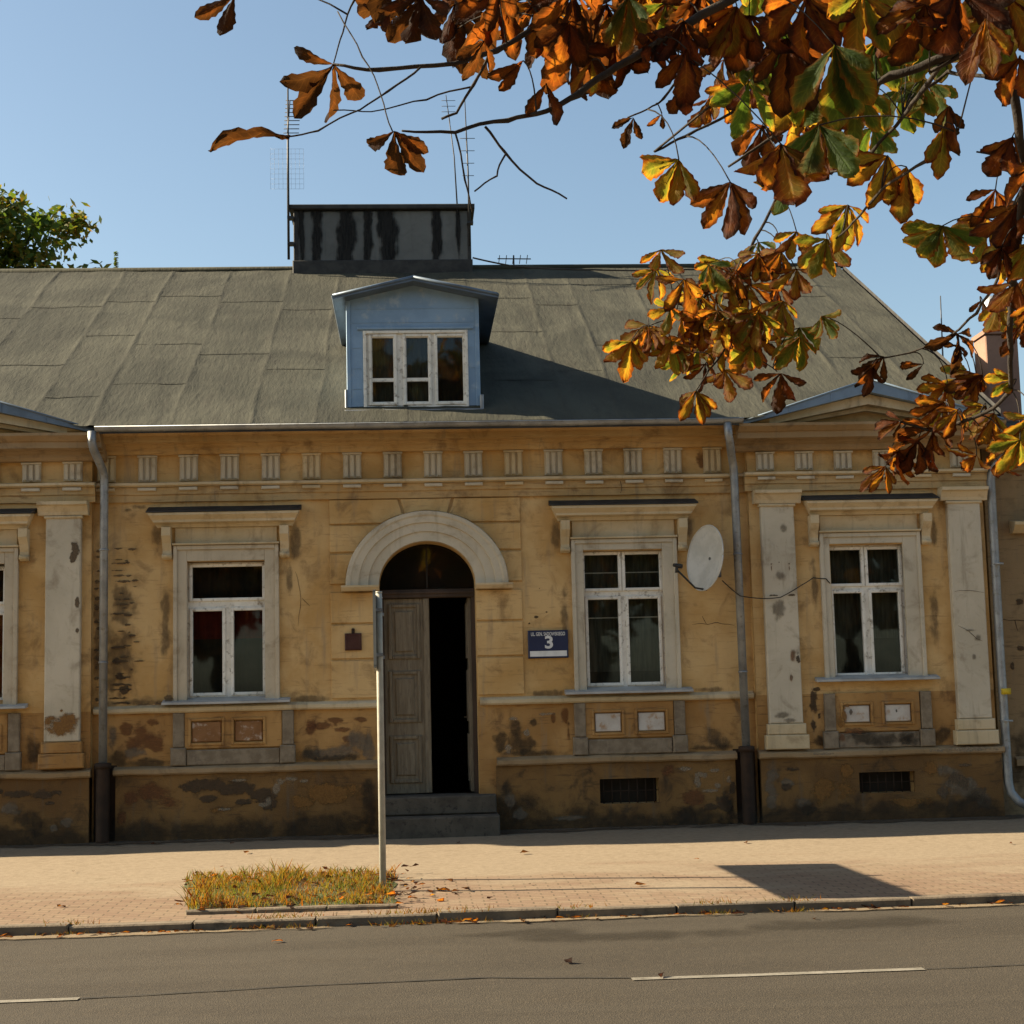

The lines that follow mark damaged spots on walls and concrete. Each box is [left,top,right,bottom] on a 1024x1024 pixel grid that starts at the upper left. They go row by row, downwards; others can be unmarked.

peeling [44,710,79,736]
flaking render [120,720,163,752]
flaking render [306,717,366,742]
spalling [179,777,308,811]